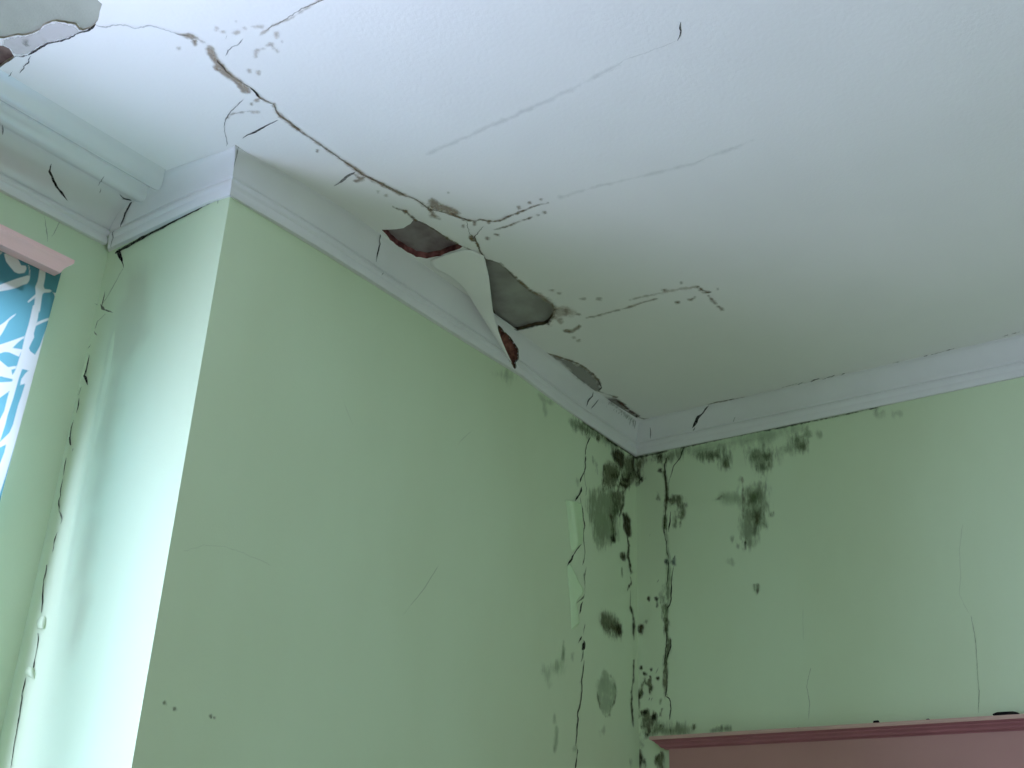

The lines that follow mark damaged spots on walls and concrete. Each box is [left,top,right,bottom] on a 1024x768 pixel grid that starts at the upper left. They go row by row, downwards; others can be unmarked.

spalling [0,0,102,66]
crack [48,165,68,201]
crack [216,40,485,258]
peeling [431,250,519,368]
peeling [549,354,602,391]
crack [11,177,132,765]
crack [567,438,590,566]
crack [575,594,585,768]
water stain [601,606,644,636]
water stain [583,422,664,587]
water stain [631,664,661,736]
crack [663,405,709,719]